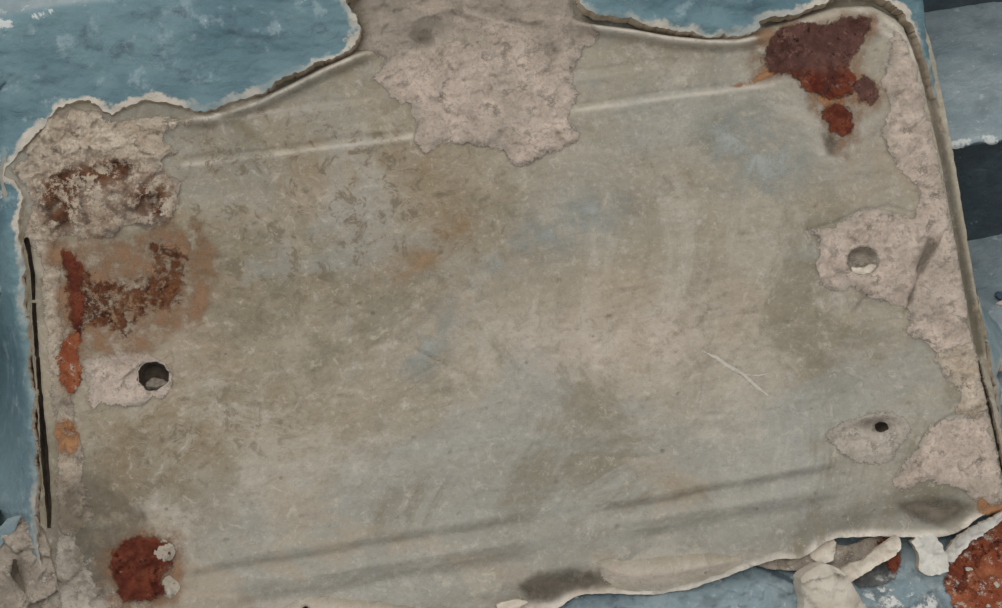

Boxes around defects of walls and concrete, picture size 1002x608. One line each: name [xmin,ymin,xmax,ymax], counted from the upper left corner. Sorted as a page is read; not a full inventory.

spalling [348,0,600,167]
corrosion [735,15,879,152]
spalling [0,106,202,608]
corrosion [47,226,214,393]
spalling [757,31,1002,608]
corrosion [102,531,182,608]